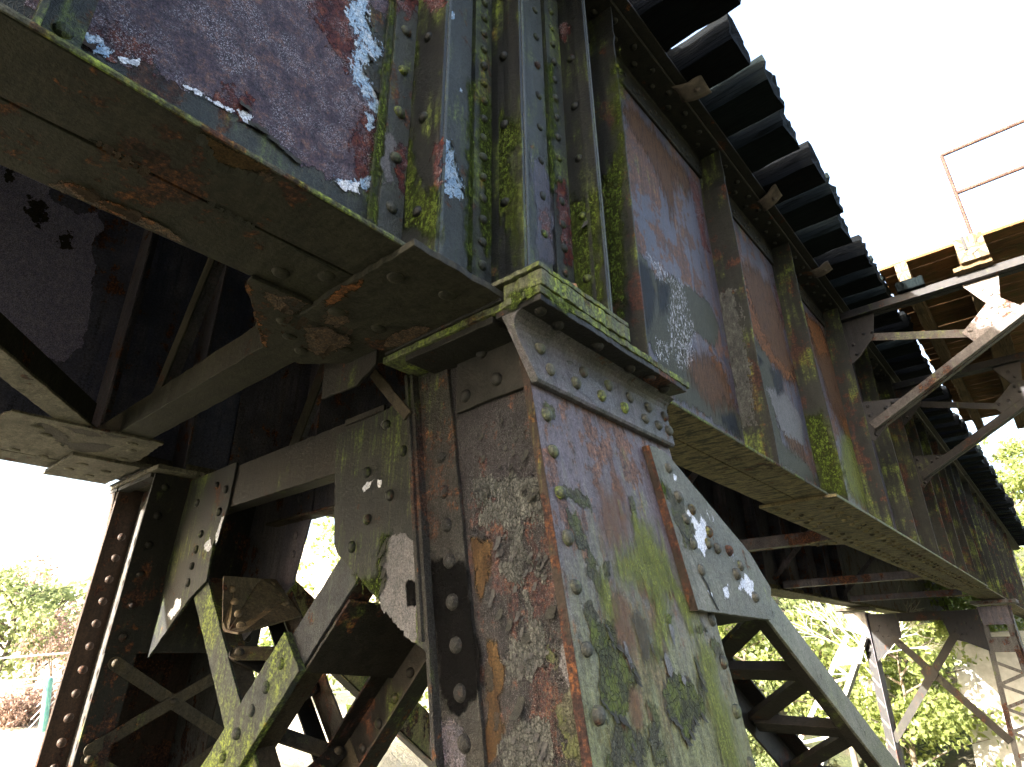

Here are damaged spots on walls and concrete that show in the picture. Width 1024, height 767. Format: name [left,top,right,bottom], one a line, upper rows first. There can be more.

peeling [83,32,140,66]
peeling [344,0,383,131]
peeling [333,175,371,194]
corrosion [621,102,711,254]
peeling [0,165,105,362]
corrosion [245,280,364,359]
peeling [353,533,417,643]
corrosion [471,537,492,603]
peeling [472,418,582,767]
water stain [632,609,665,667]
peeling [707,574,754,598]
corrosion [484,640,505,766]